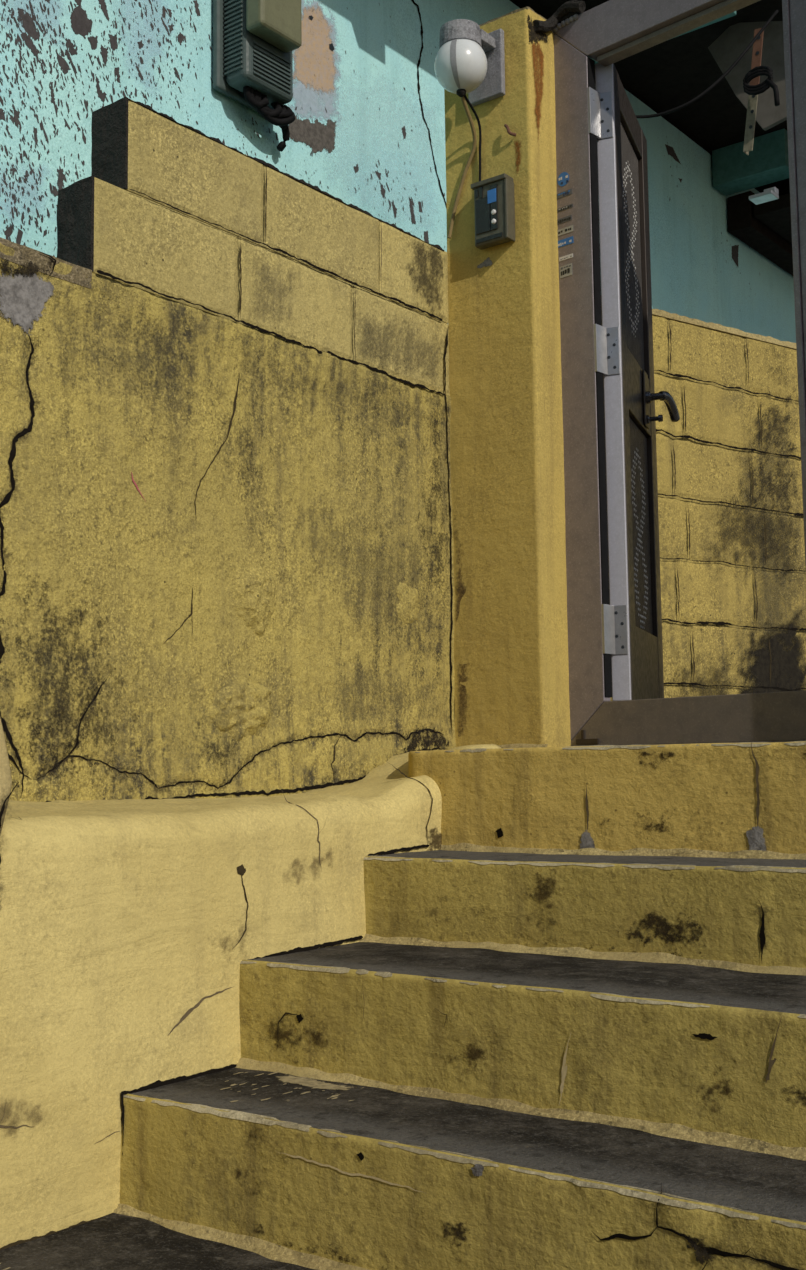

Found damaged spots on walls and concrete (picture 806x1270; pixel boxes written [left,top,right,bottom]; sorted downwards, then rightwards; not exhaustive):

peeling [0,0,213,257]
peeling [222,0,371,191]
peeling [354,126,429,243]
crack [412,0,446,204]
rust [532,43,544,138]
crack [0,165,453,869]
damp [418,418,466,619]
damp [704,396,799,579]
damp [20,593,118,771]
damp [673,610,806,697]
crack [236,864,363,959]
crack [97,1064,237,1155]